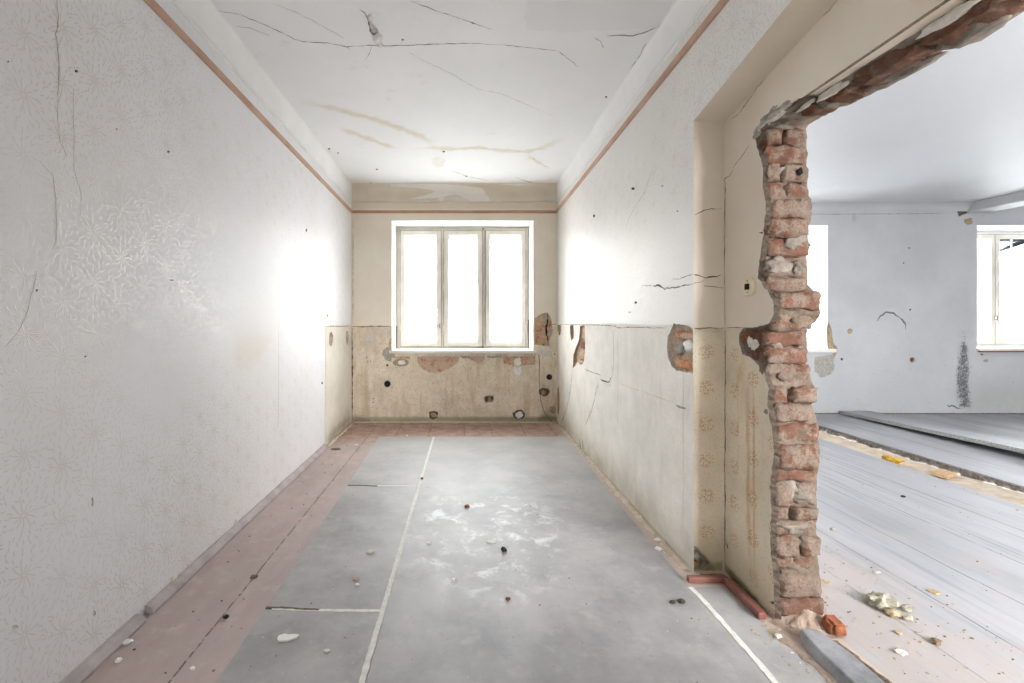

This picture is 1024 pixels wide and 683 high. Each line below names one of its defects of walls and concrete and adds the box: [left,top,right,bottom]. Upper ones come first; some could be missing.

crack [220,1,577,112]
crack [595,26,660,68]
crack [40,7,81,245]
crack [643,150,746,290]
flaking render [388,312,585,373]
crack [562,342,614,449]
flaking render [667,323,693,373]
flaking render [742,0,1024,616]
crack [873,307,911,330]
water stain [957,336,972,409]